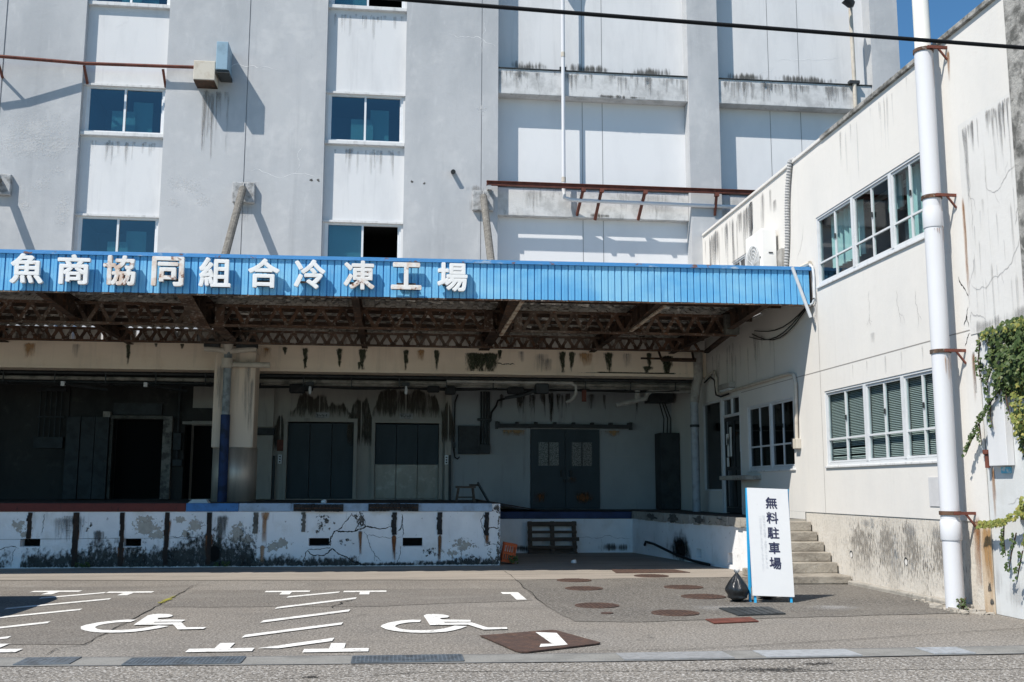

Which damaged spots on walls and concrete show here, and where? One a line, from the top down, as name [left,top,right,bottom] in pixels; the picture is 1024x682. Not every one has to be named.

leakage [567,65,667,99]
leakage [204,91,226,125]
crack [958,166,1020,345]
peeling [132,515,164,540]
peeling [176,516,205,537]
corrosion [260,512,269,561]
crack [304,512,404,564]
leakage [843,519,944,592]